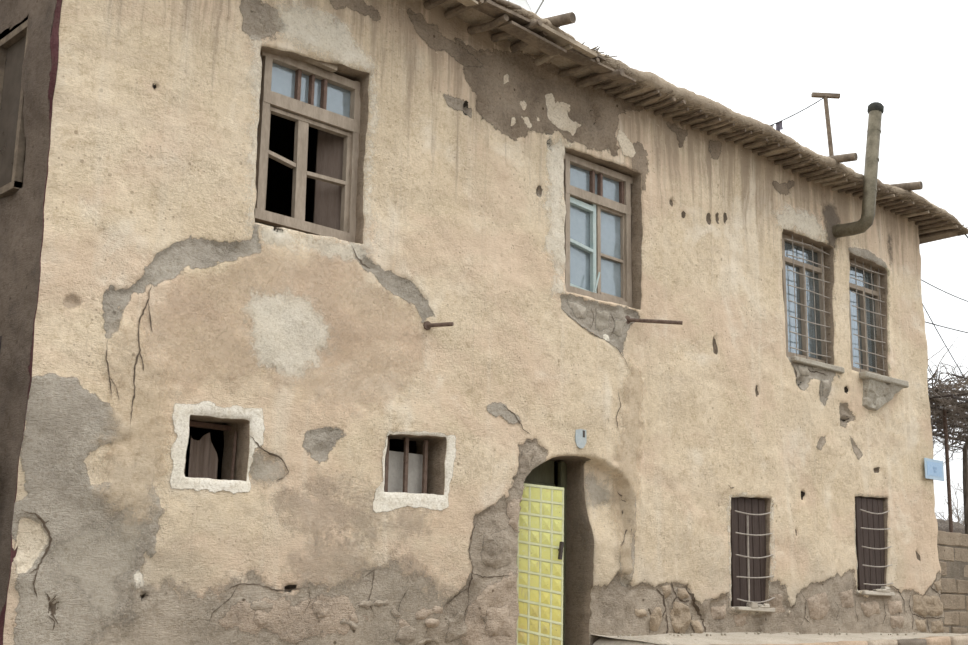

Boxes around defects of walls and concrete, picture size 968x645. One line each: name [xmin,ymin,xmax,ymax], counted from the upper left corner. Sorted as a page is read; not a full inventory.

spalling [407,8,644,158]
crack [106,284,153,425]
flaking render [560,293,639,356]
flaking render [788,357,839,406]
flaking render [839,386,855,428]
spalling [14,517,49,574]
peeling [133,570,148,601]
flaking render [424,439,548,645]
flaking render [589,497,944,645]